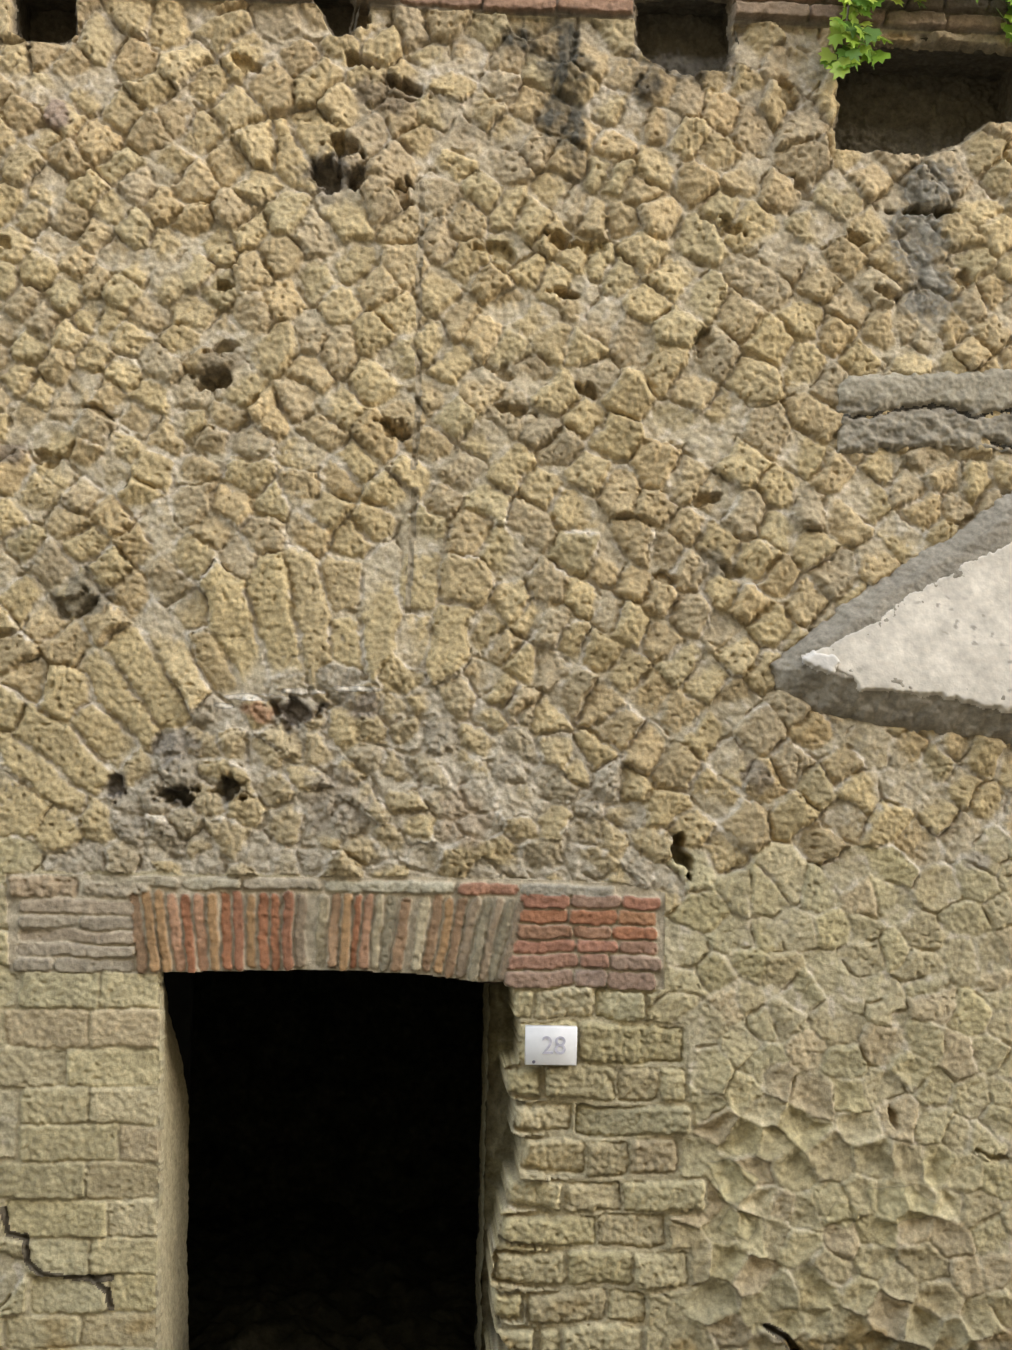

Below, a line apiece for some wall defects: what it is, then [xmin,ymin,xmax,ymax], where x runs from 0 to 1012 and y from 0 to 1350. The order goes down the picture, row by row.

crack [0,1206,114,1310]
crack [762,1323,802,1350]